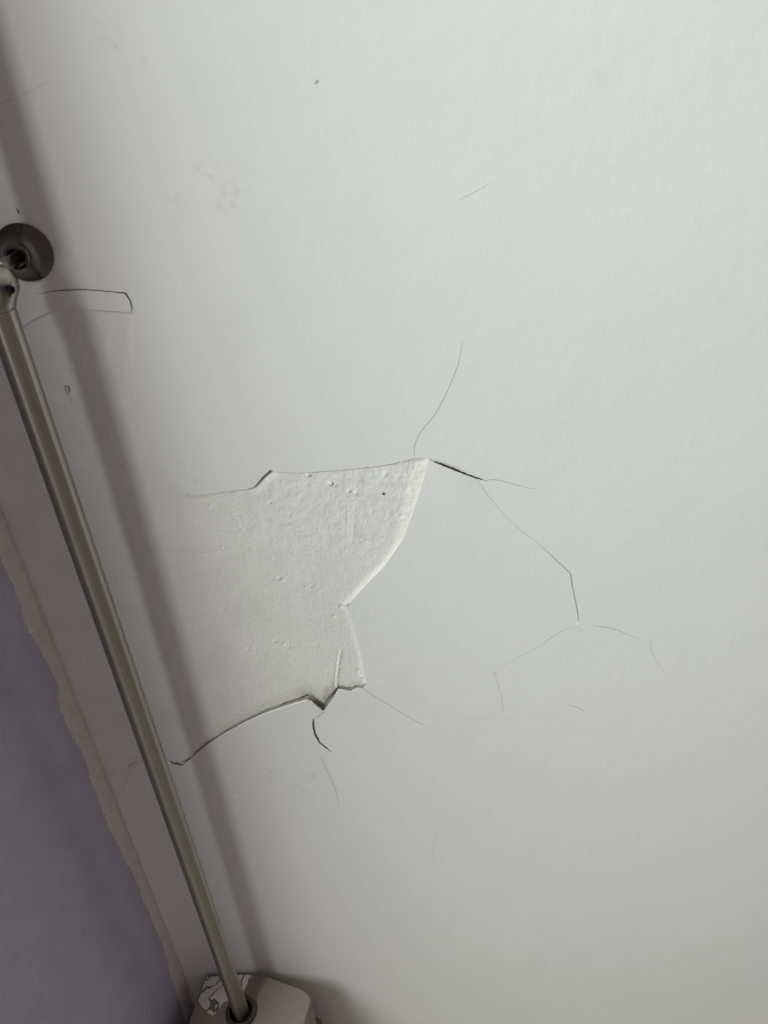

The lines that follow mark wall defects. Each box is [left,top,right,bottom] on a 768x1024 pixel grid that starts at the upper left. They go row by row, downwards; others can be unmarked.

crack [39,289,132,309]
peeling [0,359,144,802]
peeling [23,309,428,764]
crack [312,713,338,798]
crack [414,345,709,710]